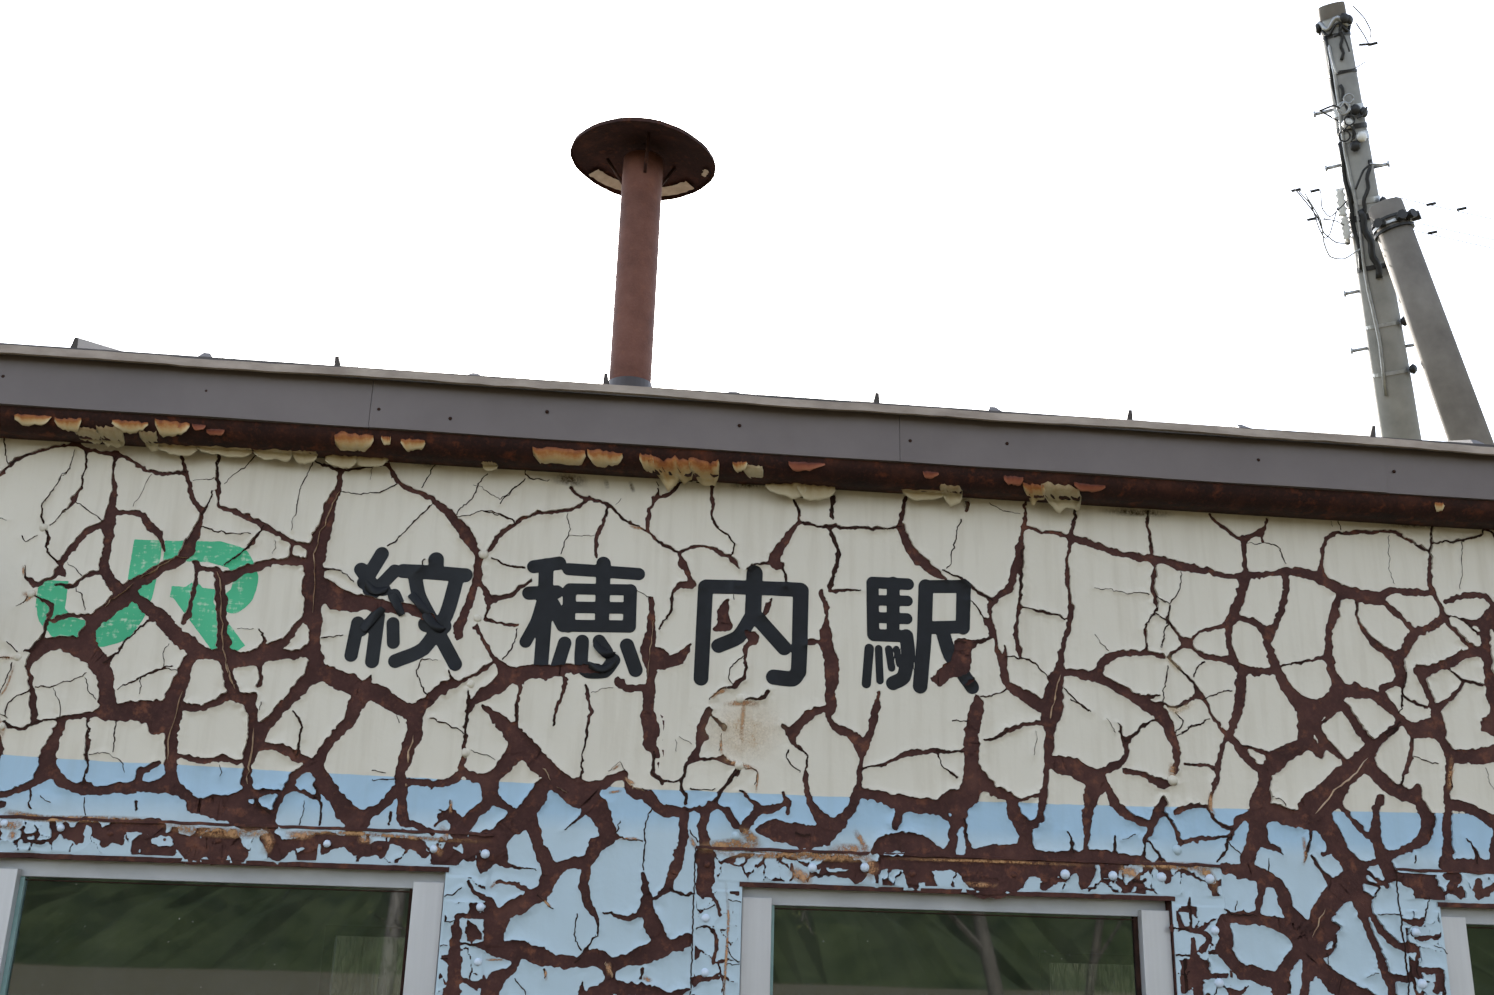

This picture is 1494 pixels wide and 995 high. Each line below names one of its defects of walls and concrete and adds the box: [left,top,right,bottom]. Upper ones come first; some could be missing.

peeling [14,414,425,469]
peeling [533,447,835,501]
peeling [713,594,735,632]
peeling [930,634,992,687]
crack [0,438,1494,995]
peeling [0,793,508,866]
rust [691,829,876,883]
peeling [696,819,1221,917]
rust [1121,862,1215,886]
peeling [1400,873,1494,900]
peeling [438,885,486,995]
peeling [1176,906,1227,995]